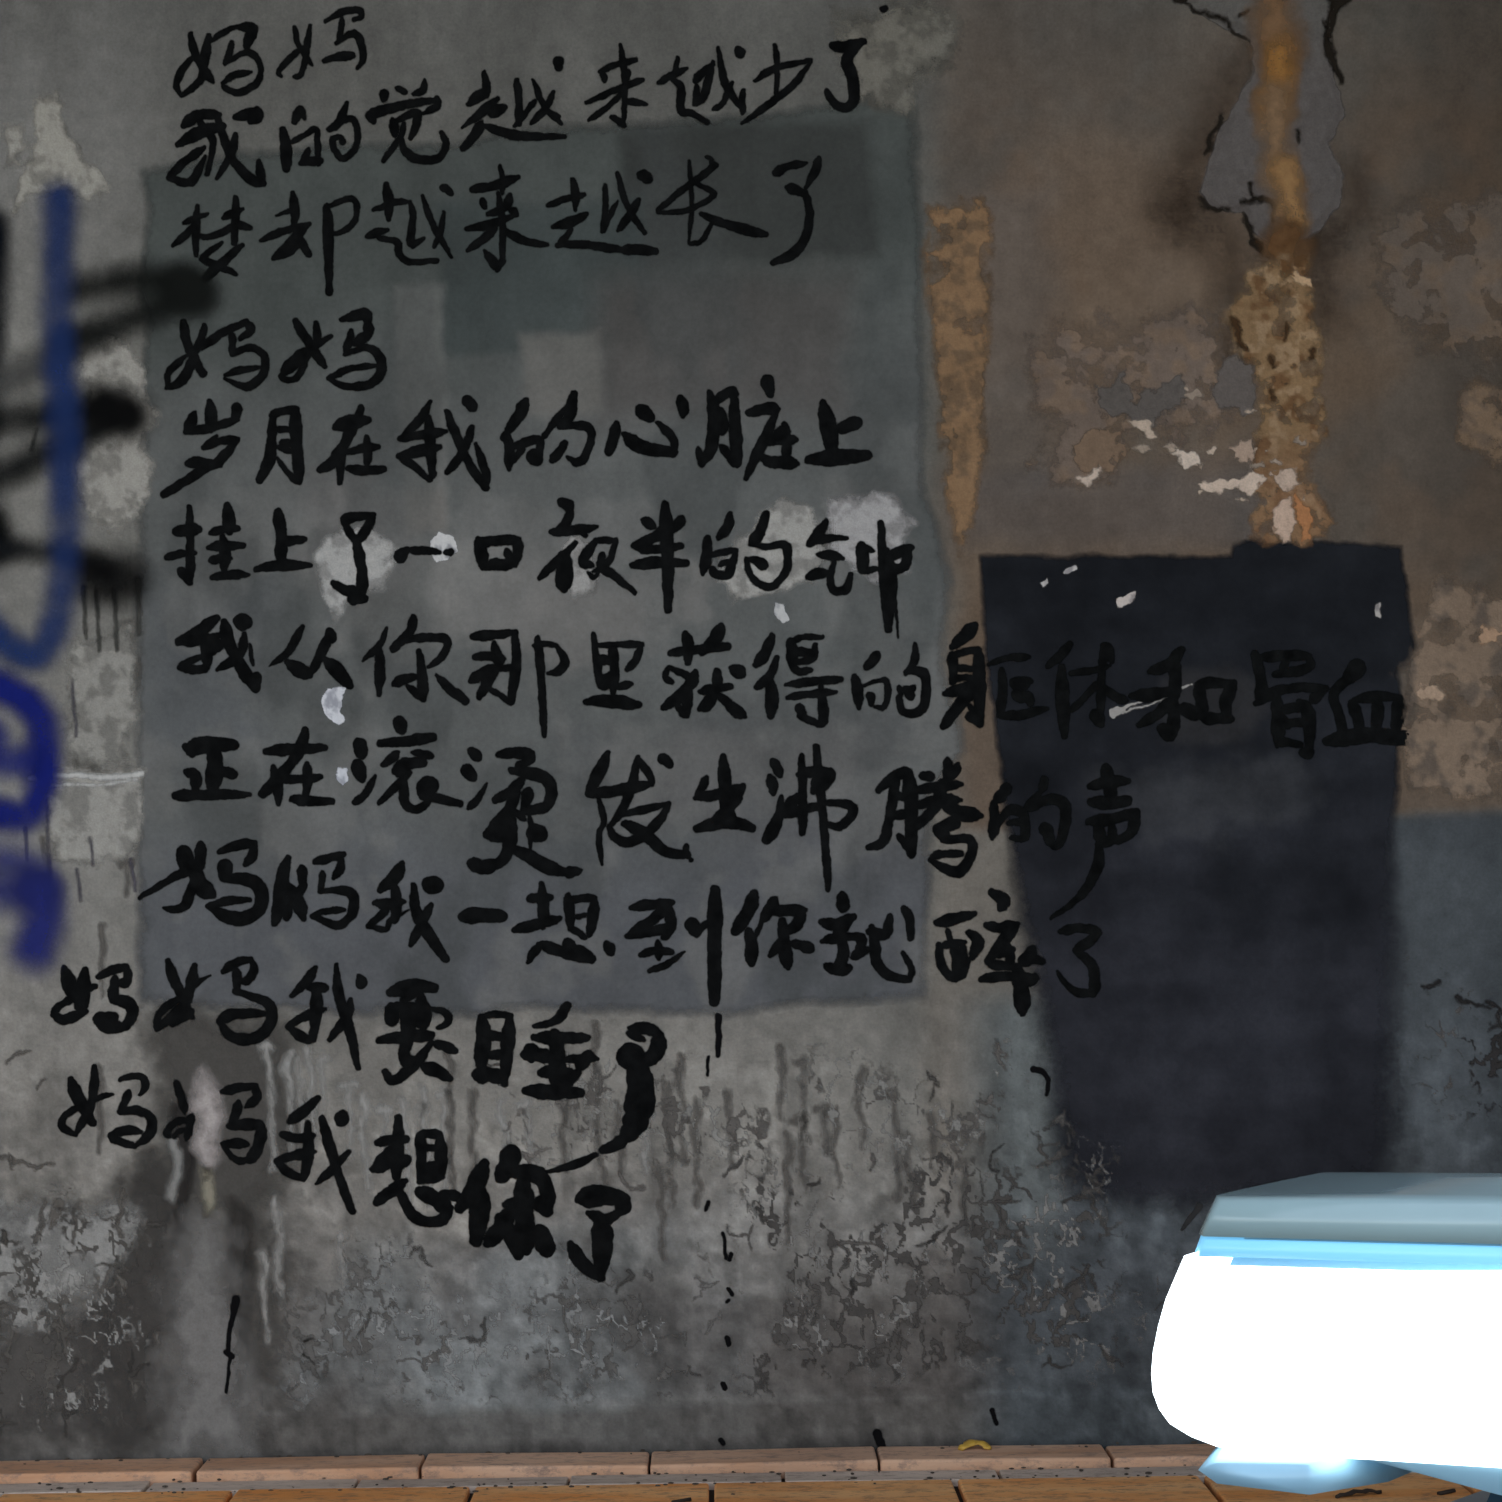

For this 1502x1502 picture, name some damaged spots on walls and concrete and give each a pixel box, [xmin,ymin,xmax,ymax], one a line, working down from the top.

rust [1252,0,1310,278]
peeling [922,197,993,543]
peeling [1026,255,1334,547]
peeling [1370,189,1502,469]
peeling [1401,575,1502,801]
crack [6,1050,44,1090]
crack [0,1154,78,1245]
crack [116,1188,127,1238]